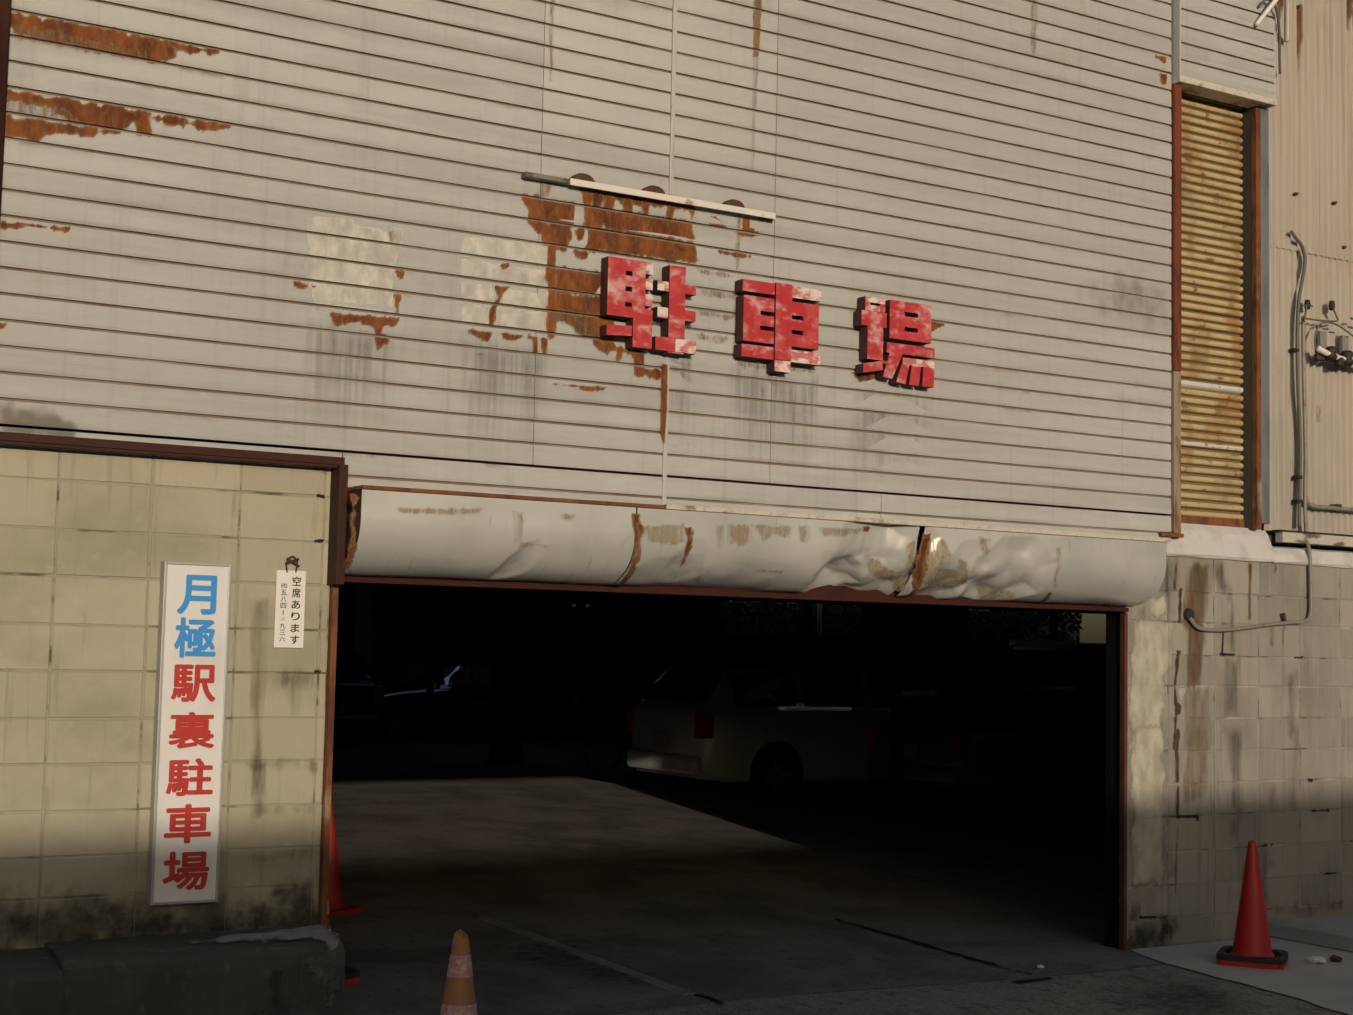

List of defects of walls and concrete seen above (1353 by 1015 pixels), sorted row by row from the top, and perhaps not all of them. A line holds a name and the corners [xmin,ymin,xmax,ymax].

corrosion [10,12,220,64]
corrosion [753,0,762,57]
corrosion [5,88,231,141]
corrosion [1,221,70,233]
corrosion [522,182,774,443]
corrosion [615,513,645,586]
corrosion [681,527,694,566]
damp [1184,563,1226,799]